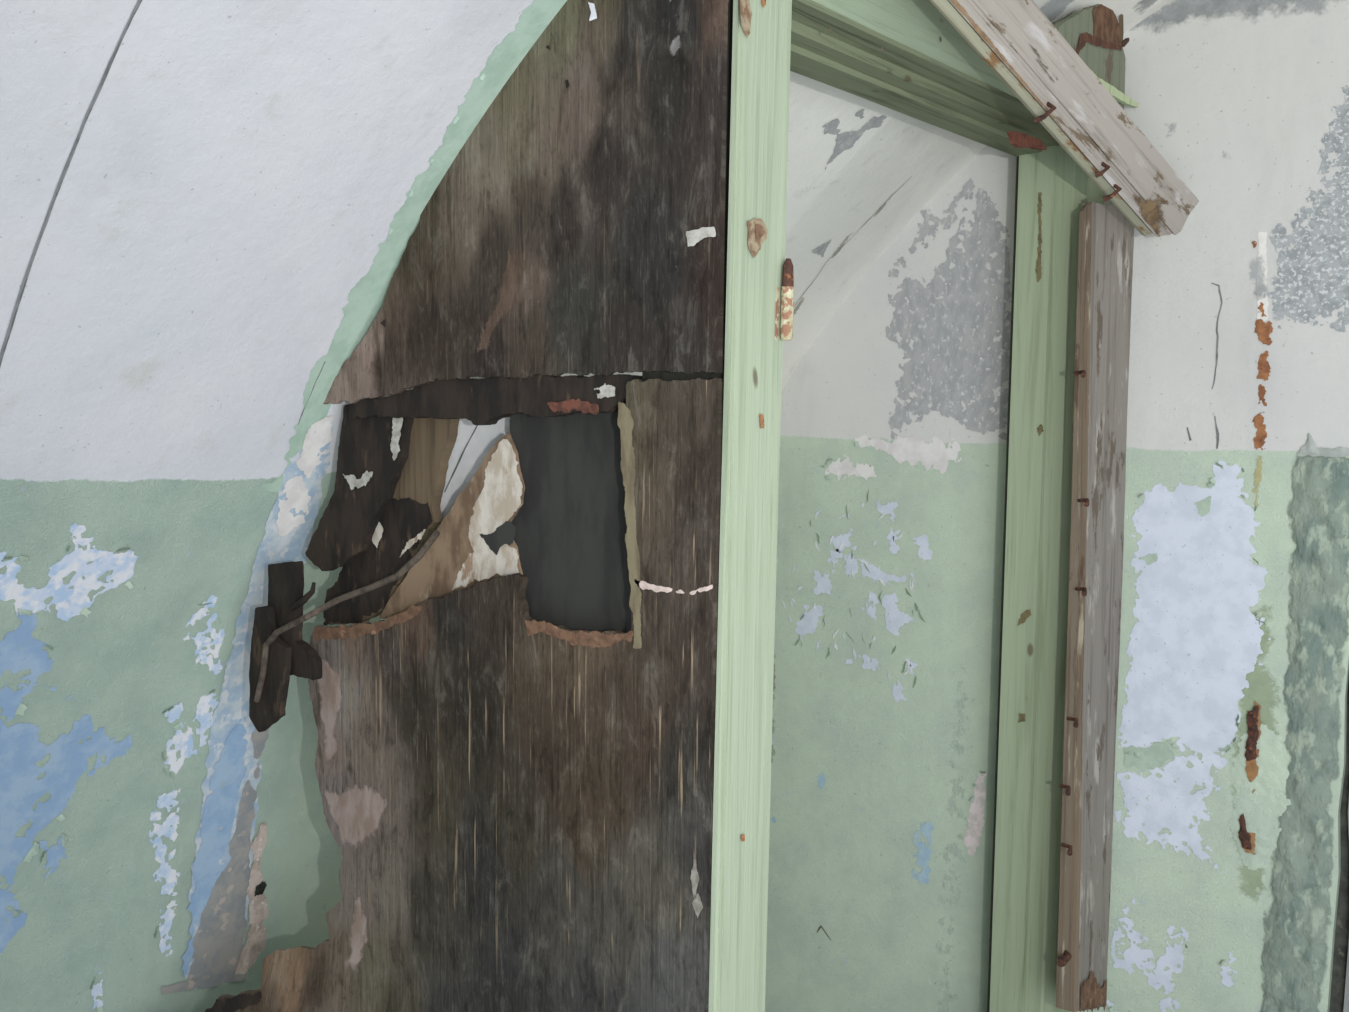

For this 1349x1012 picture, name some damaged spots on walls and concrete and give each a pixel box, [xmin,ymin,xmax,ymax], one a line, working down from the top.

peeling [1251,85,1349,332]
peeling [343,471,373,490]
peeling [777,178,1012,702]
corrosion [1252,232,1273,505]
peeling [0,523,139,953]
peeling [90,972,104,1012]
flaking render [149,416,334,995]
peeling [1110,899,1190,1012]
peeling [1115,460,1271,873]
peeling [1219,951,1237,987]
corrosion [1238,814,1263,897]
corrosion [1233,608,1275,793]